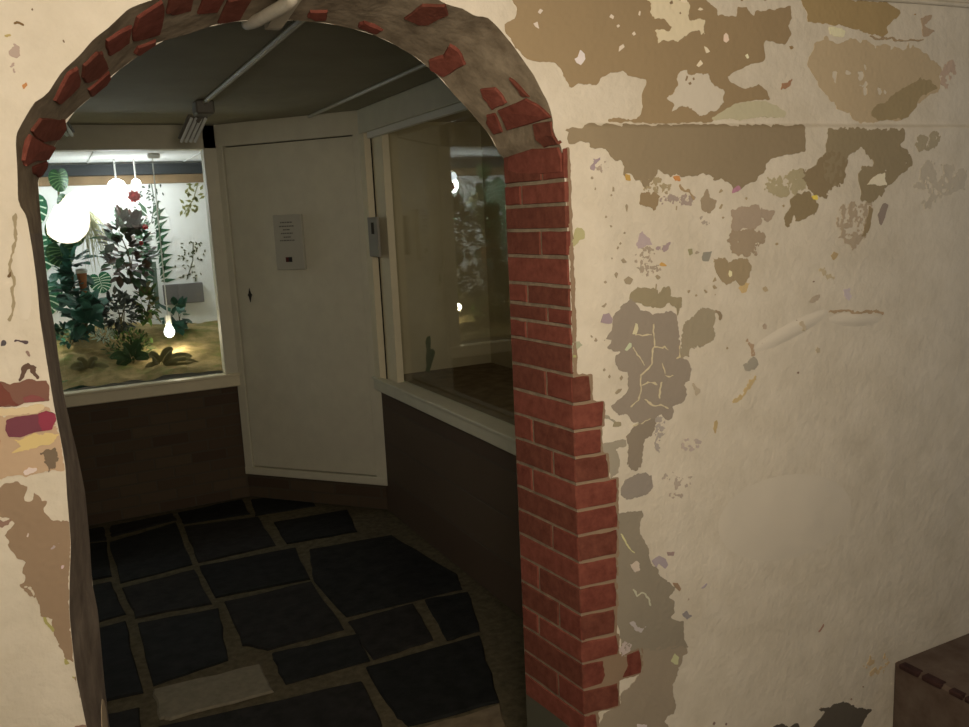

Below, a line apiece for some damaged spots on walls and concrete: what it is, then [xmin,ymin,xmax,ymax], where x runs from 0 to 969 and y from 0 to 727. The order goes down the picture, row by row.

crack [605,324,681,427]
peeling [505,0,913,727]
peeling [0,379,73,662]